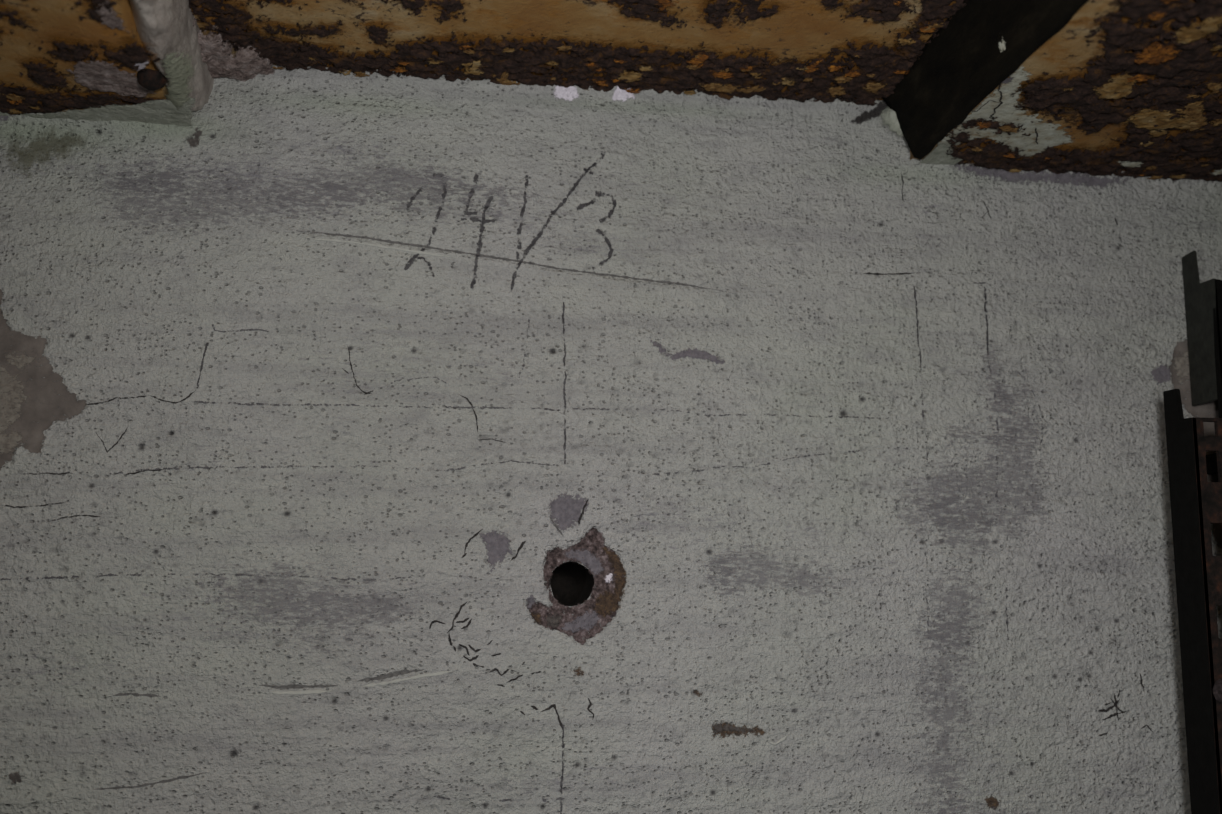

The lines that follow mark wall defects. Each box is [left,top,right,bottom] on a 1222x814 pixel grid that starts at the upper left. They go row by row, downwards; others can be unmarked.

rust [0,0,167,125]
rust [188,0,967,106]
rust [934,0,1222,189]
rust [594,547,626,617]
crack [429,602,541,687]
crack [520,698,594,730]